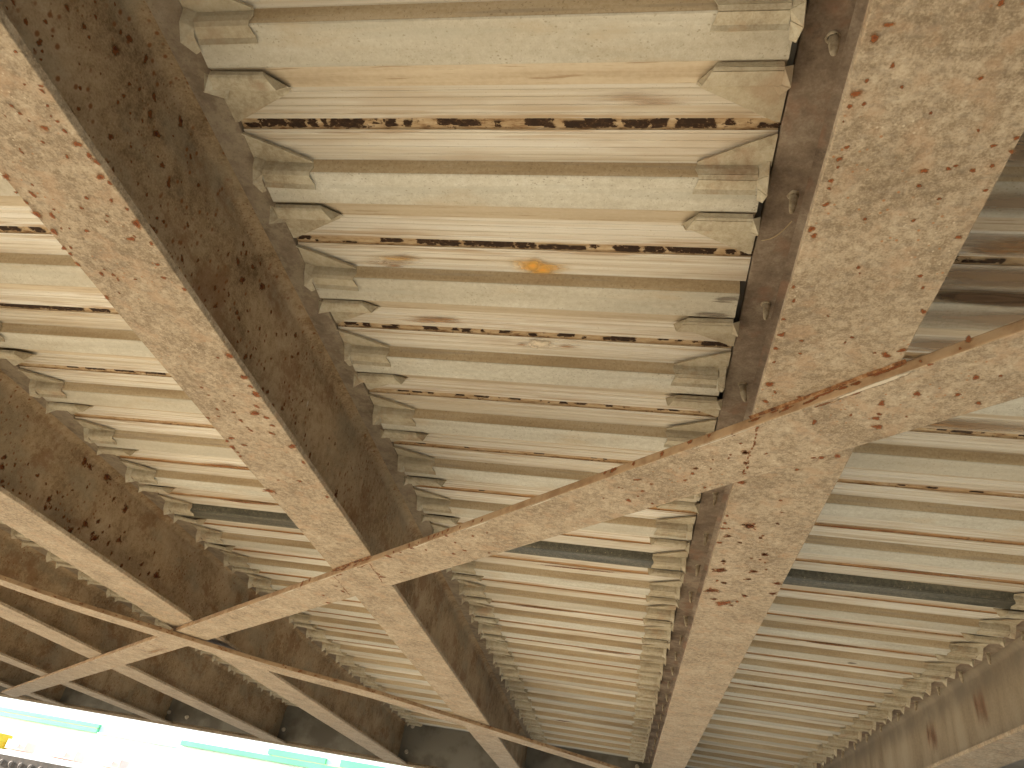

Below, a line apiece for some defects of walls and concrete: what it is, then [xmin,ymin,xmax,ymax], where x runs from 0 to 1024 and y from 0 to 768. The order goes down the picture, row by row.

rust [4,84,114,185]
rust [117,82,183,138]
rust [2,174,80,266]
rust [125,205,165,246]
rust [519,261,558,273]
rust [206,376,310,435]
rust [728,348,933,484]
rust [0,454,126,555]
rust [704,560,747,606]